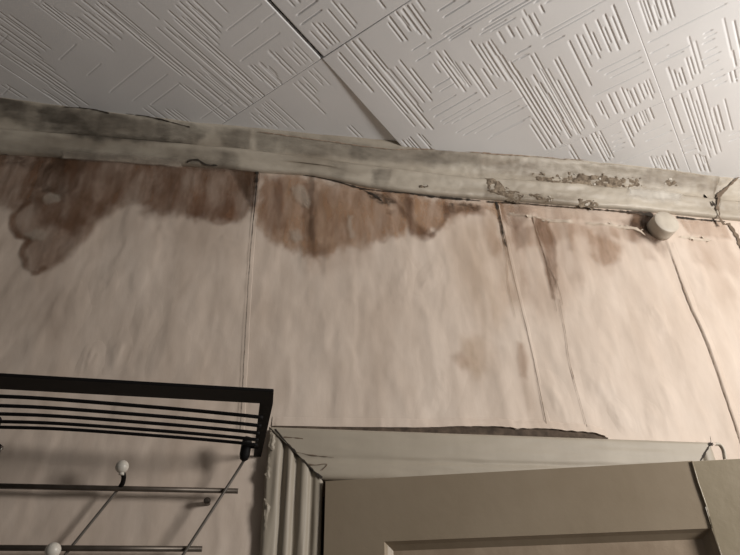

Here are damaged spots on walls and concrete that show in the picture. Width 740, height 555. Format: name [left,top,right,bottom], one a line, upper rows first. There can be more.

leakage [0,152,256,265]
leakage [263,178,478,254]
spalling [485,178,554,204]
spalling [532,172,642,189]
spalling [578,199,599,210]
crack [677,177,740,245]